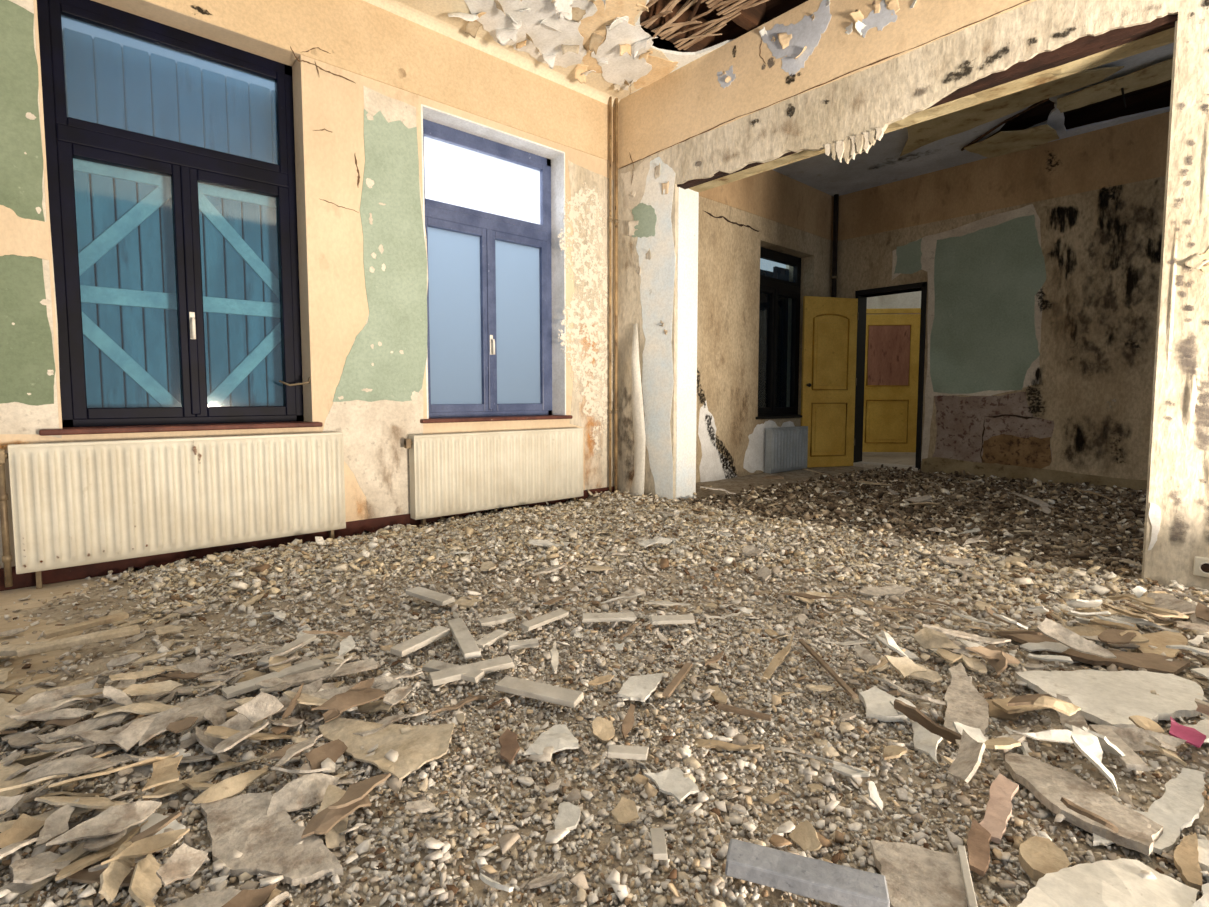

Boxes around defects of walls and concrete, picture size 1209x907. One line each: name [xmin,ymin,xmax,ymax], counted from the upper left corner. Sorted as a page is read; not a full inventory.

peeling [397,0,745,153]
peeling [759,0,832,76]
peeling [845,0,917,38]
damp [1173,140,1195,248]
peeling [369,244,386,273]
damp [1036,185,1209,373]
flaking render [697,370,794,482]
damp [932,368,1130,469]
damp [1178,336,1209,450]
damp [1170,492,1189,541]